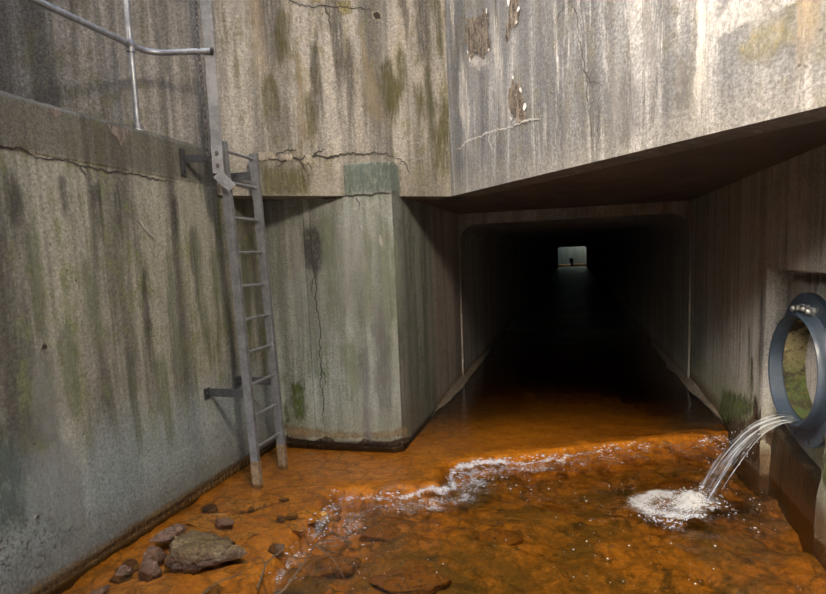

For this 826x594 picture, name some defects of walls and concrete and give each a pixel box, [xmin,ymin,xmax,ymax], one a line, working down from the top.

crack [289,0,375,31]
water stain [328,0,354,100]
spalling [464,8,490,62]
spalling [505,0,520,43]
water stain [311,47,322,106]
spalling [508,76,529,124]
crack [456,110,537,151]
crack [0,145,178,183]
crack [273,149,410,173]
crack [309,192,389,430]